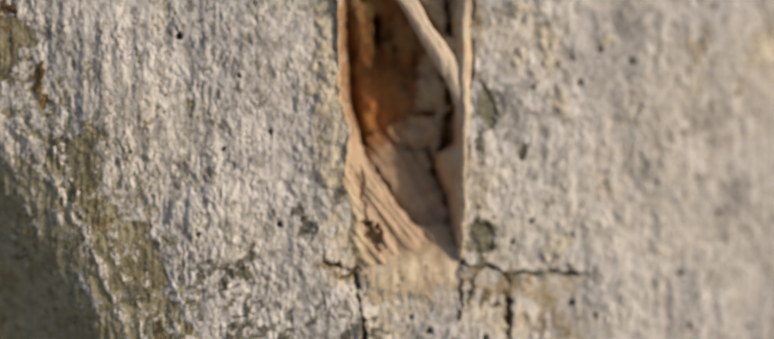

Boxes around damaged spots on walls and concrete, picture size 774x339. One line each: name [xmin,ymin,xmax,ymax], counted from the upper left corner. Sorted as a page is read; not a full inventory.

spalling [334,0,514,305]
crack [323,261,368,339]
crack [457,257,599,339]